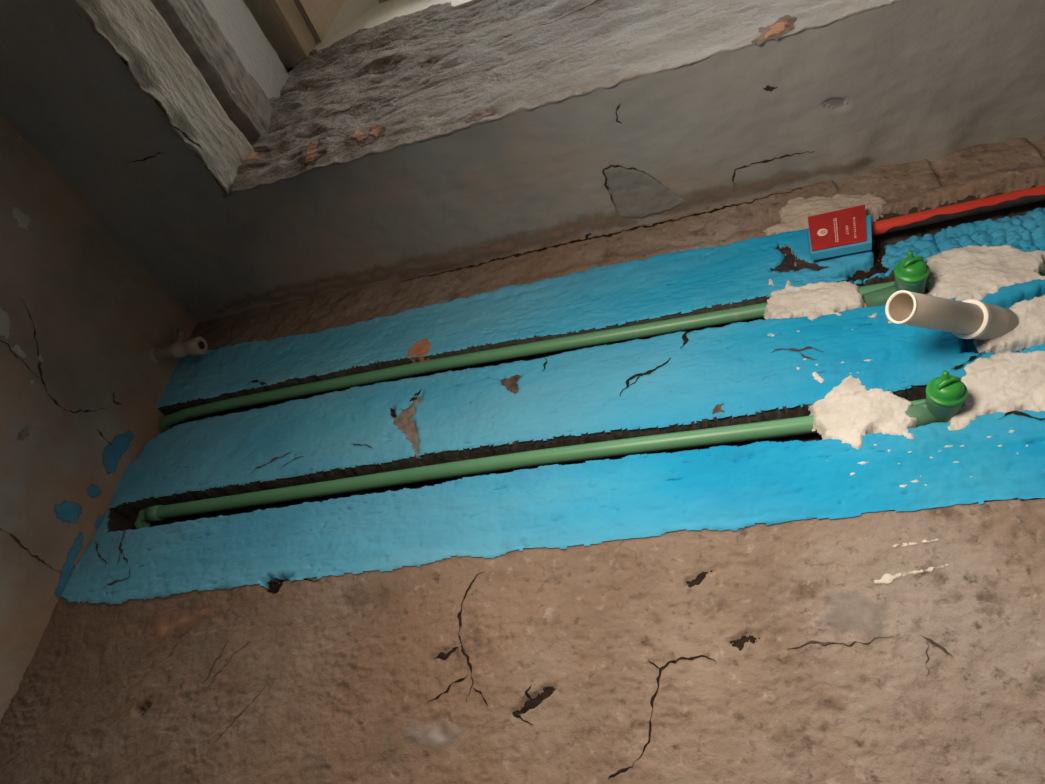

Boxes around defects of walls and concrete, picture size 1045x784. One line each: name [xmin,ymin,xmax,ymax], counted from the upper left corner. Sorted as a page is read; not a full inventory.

crack [0,299,122,445]
crack [0,528,63,575]
crack [427,572,488,706]
crack [608,655,715,779]